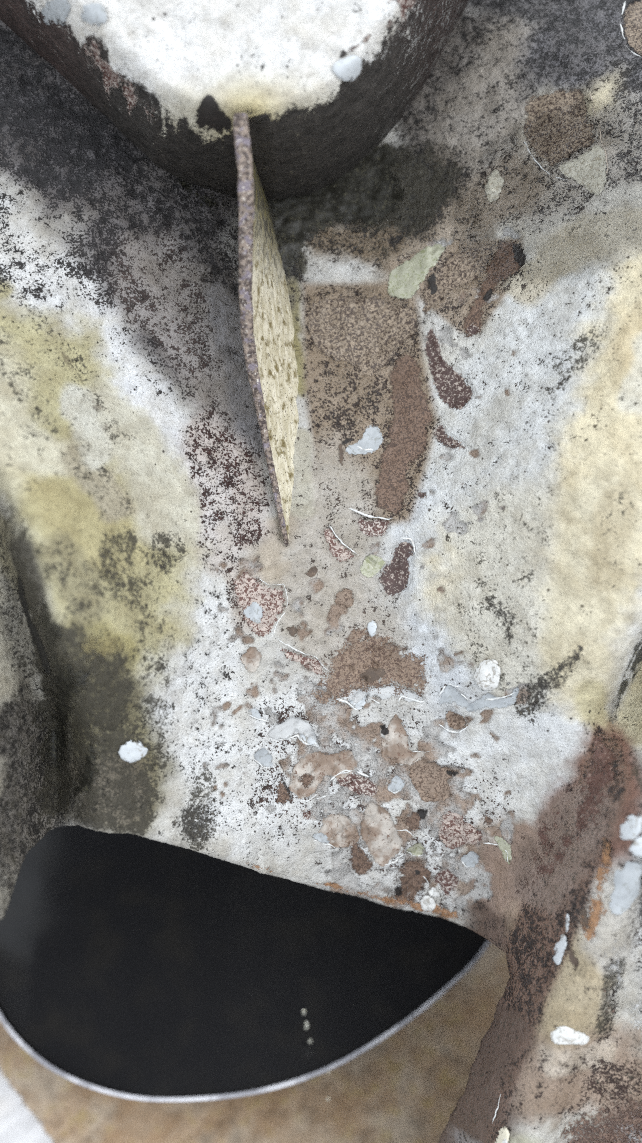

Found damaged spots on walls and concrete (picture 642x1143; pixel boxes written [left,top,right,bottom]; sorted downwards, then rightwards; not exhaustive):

damp [267,143,405,287]
peeling [307,244,492,410]
damp [35,602,99,796]
peeling [233,572,327,675]
spalling [335,588,354,609]
peeling [438,659,513,701]
damp [172,787,223,851]
peeling [254,696,512,911]
corrosion [530,728,620,941]
corrosion [560,1088,642,1143]